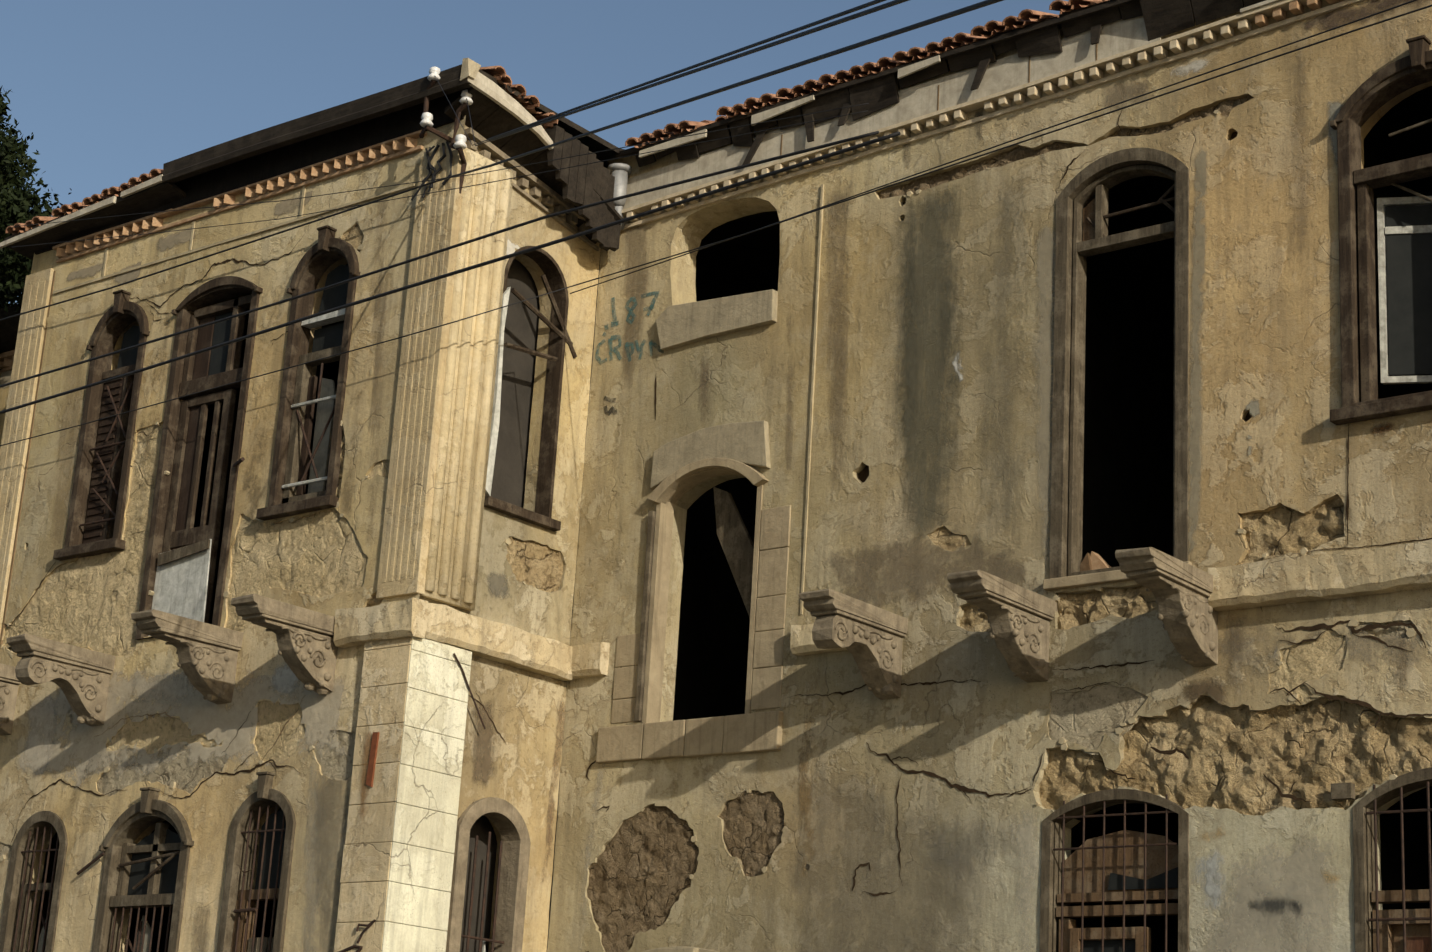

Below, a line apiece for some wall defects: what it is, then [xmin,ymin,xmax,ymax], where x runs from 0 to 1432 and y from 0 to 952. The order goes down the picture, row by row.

crack [129,235,304,321]
leakage [832,195,1025,607]
flaking render [505,537,563,592]
flaking render [1052,551,1158,629]
flaking render [1237,495,1345,565]
flaking render [76,715,230,797]
flaking render [1035,619,1432,816]
flaking render [719,790,785,877]
flaking render [587,804,699,952]